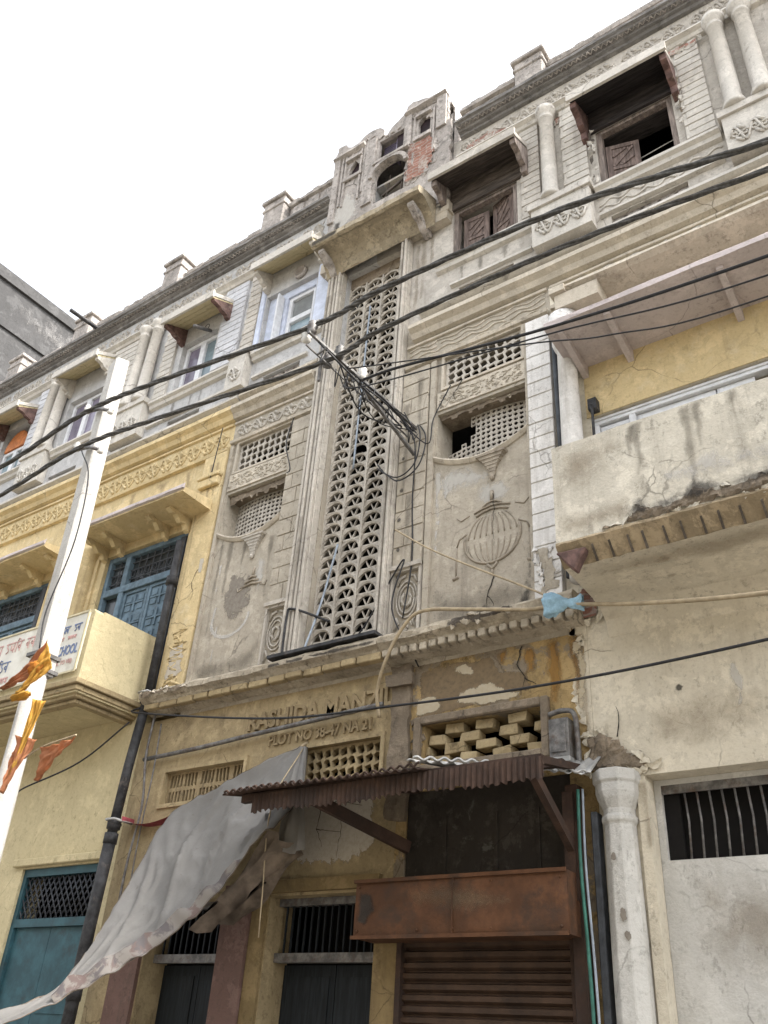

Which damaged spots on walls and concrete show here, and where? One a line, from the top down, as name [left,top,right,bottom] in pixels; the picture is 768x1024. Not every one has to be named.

flaking render [403,132,439,186]
flaking render [602,468,768,530]
peeling [409,657,531,768]
crack [516,646,536,685]
flaking render [566,588,663,779]
peeling [297,805,374,865]
peeling [334,799,375,822]